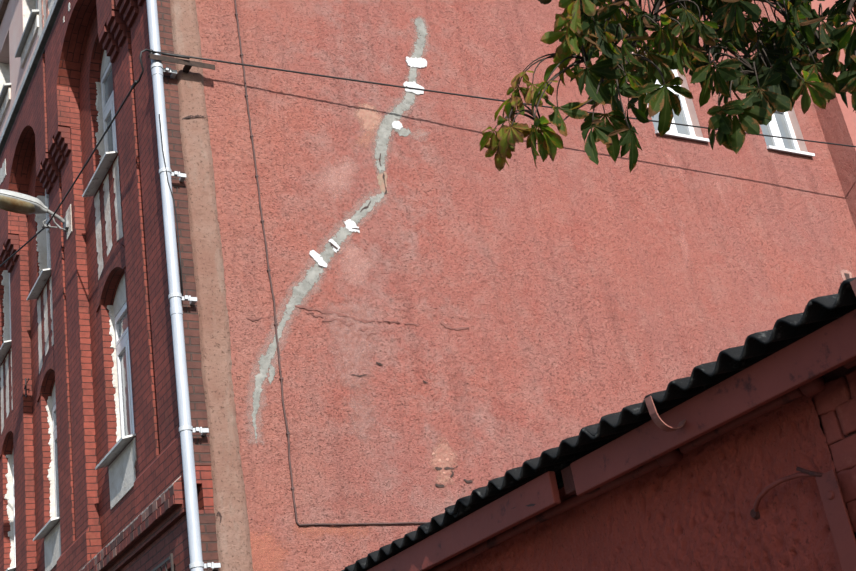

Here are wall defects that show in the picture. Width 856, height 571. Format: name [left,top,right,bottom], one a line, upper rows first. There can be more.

crack [246,17,429,443]